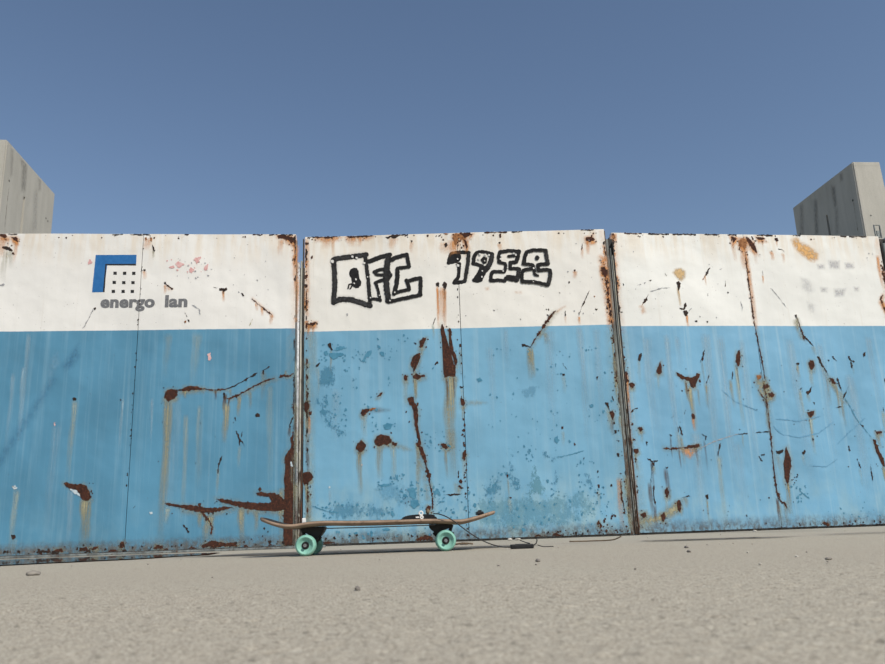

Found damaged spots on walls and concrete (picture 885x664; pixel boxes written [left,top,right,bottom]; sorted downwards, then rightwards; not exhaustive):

peeling [166,257,212,279]
rust [243,234,415,339]
rust [436,282,458,311]
rust [427,232,472,251]
rust [793,235,817,259]
rust [411,337,429,392]
rust [536,229,778,537]
rust [440,321,469,499]
rust [0,350,315,555]
rust [353,432,397,466]
rust [783,447,798,497]